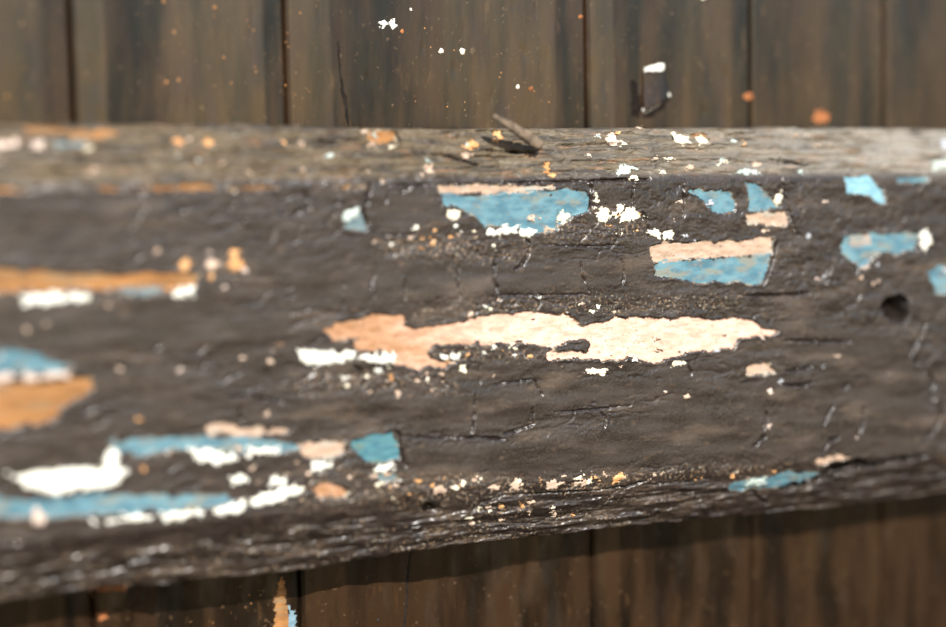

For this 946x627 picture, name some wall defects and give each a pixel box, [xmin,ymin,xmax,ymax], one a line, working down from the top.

peeling [0,249,245,307]
crack [492,218,585,296]
peeling [438,184,641,238]
peeling [616,164,639,181]
peeling [671,131,708,147]
peeling [646,165,788,285]
crack [770,158,808,230]
peeling [297,311,776,376]
peeling [0,349,93,429]
peeling [0,422,399,526]
crack [396,380,542,463]
crack [754,384,940,503]